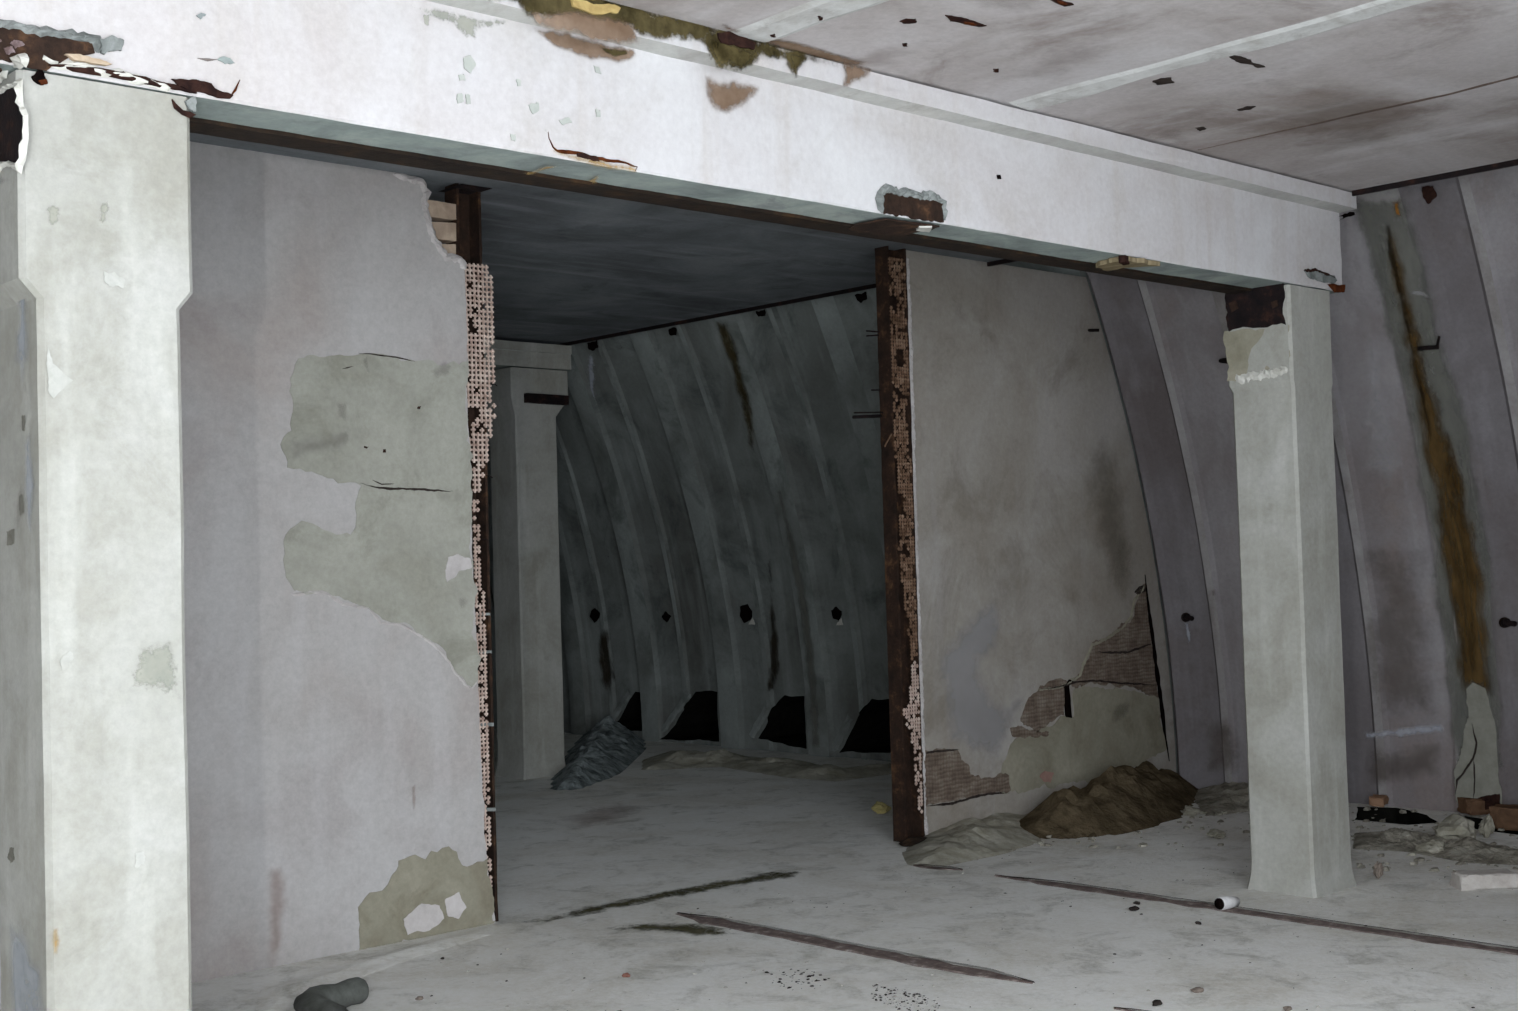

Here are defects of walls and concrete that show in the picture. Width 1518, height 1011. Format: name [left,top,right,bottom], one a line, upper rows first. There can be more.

spalling [0,19,172,174]
spalling [848,183,948,236]
spalling [1235,366,1288,384]
flaking render [280,353,481,689]
rust [1387,226,1489,690]
flaking render [922,584,1167,806]
flaking render [358,846,495,950]